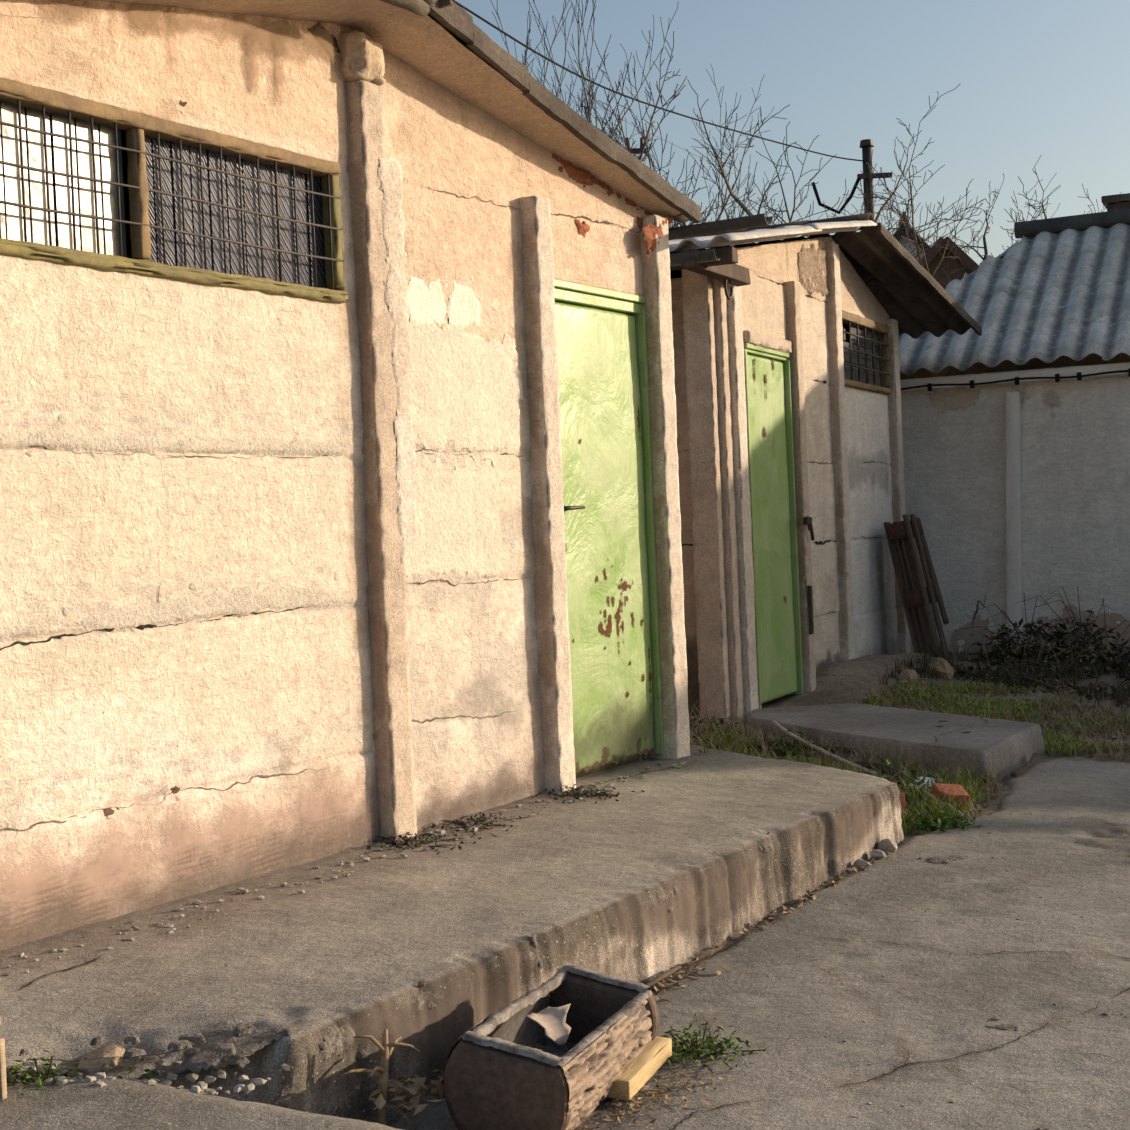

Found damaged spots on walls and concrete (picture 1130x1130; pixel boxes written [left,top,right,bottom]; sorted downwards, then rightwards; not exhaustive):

leakage [50,0,96,22]
leakage [129,3,339,96]
flaking render [552,154,674,255]
flaking render [378,156,526,579]
crack [5,445,328,459]
crack [0,583,316,651]
rust [595,559,644,665]
rust [575,739,653,773]
crack [0,767,338,832]
crack [19,947,117,990]